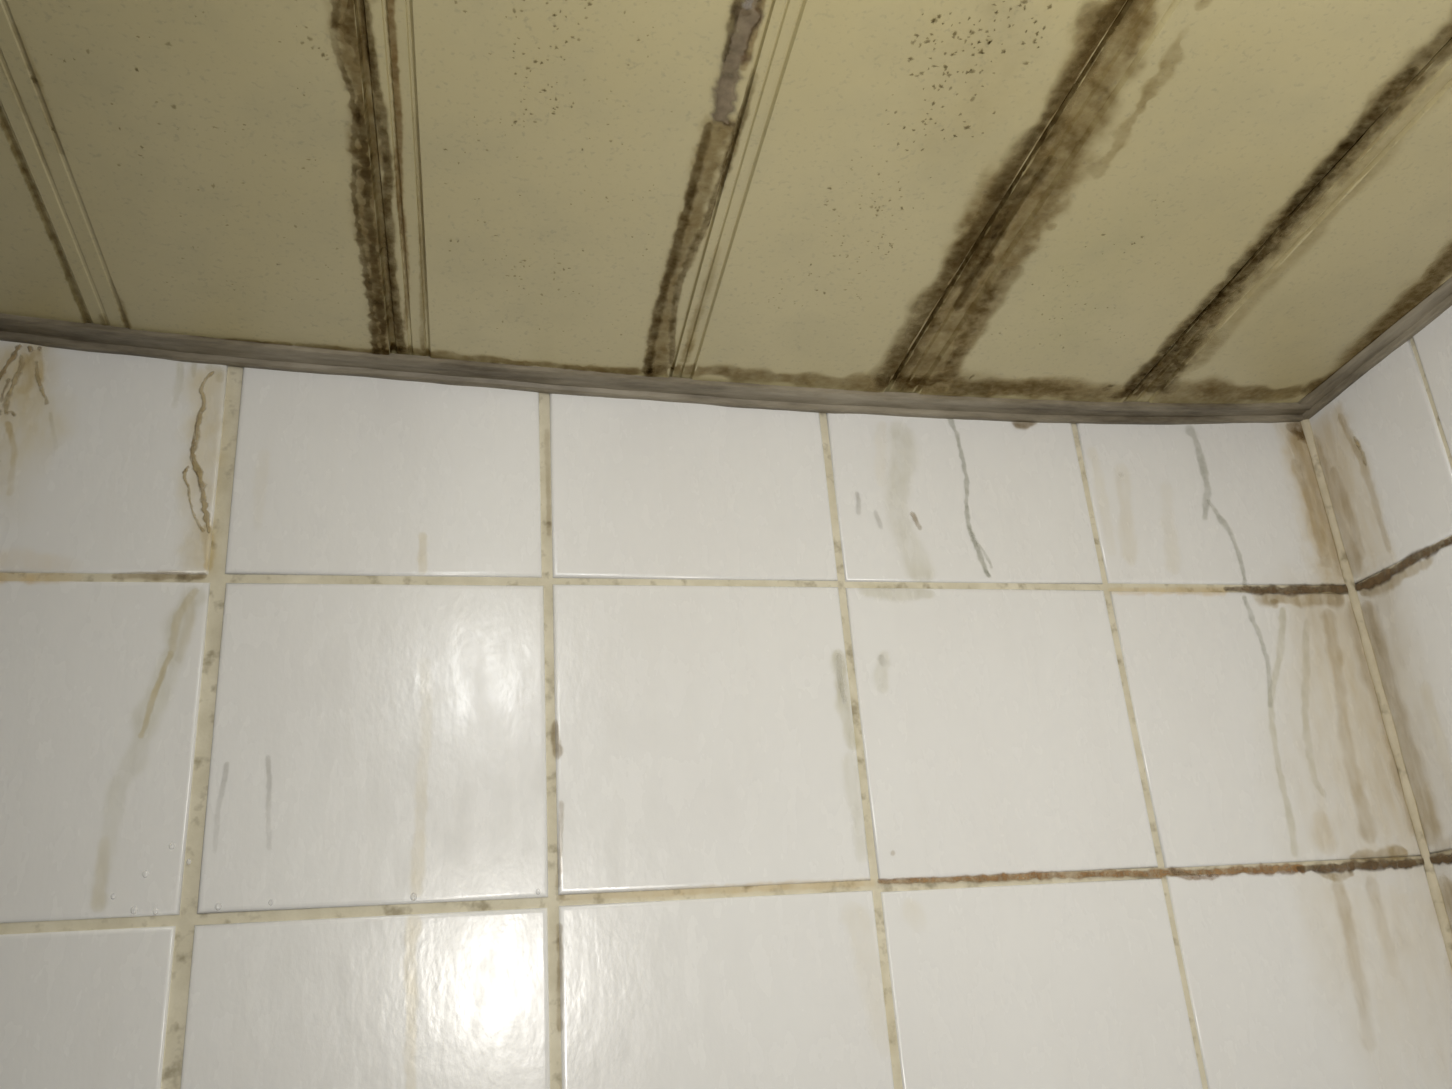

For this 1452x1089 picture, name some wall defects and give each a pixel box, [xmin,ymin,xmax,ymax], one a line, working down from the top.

leakage [344,0,403,229]
leakage [664,0,763,282]
leakage [1131,26,1452,391]
leakage [643,301,665,373]
rust [1225,536,1452,595]
rust [879,854,1452,883]